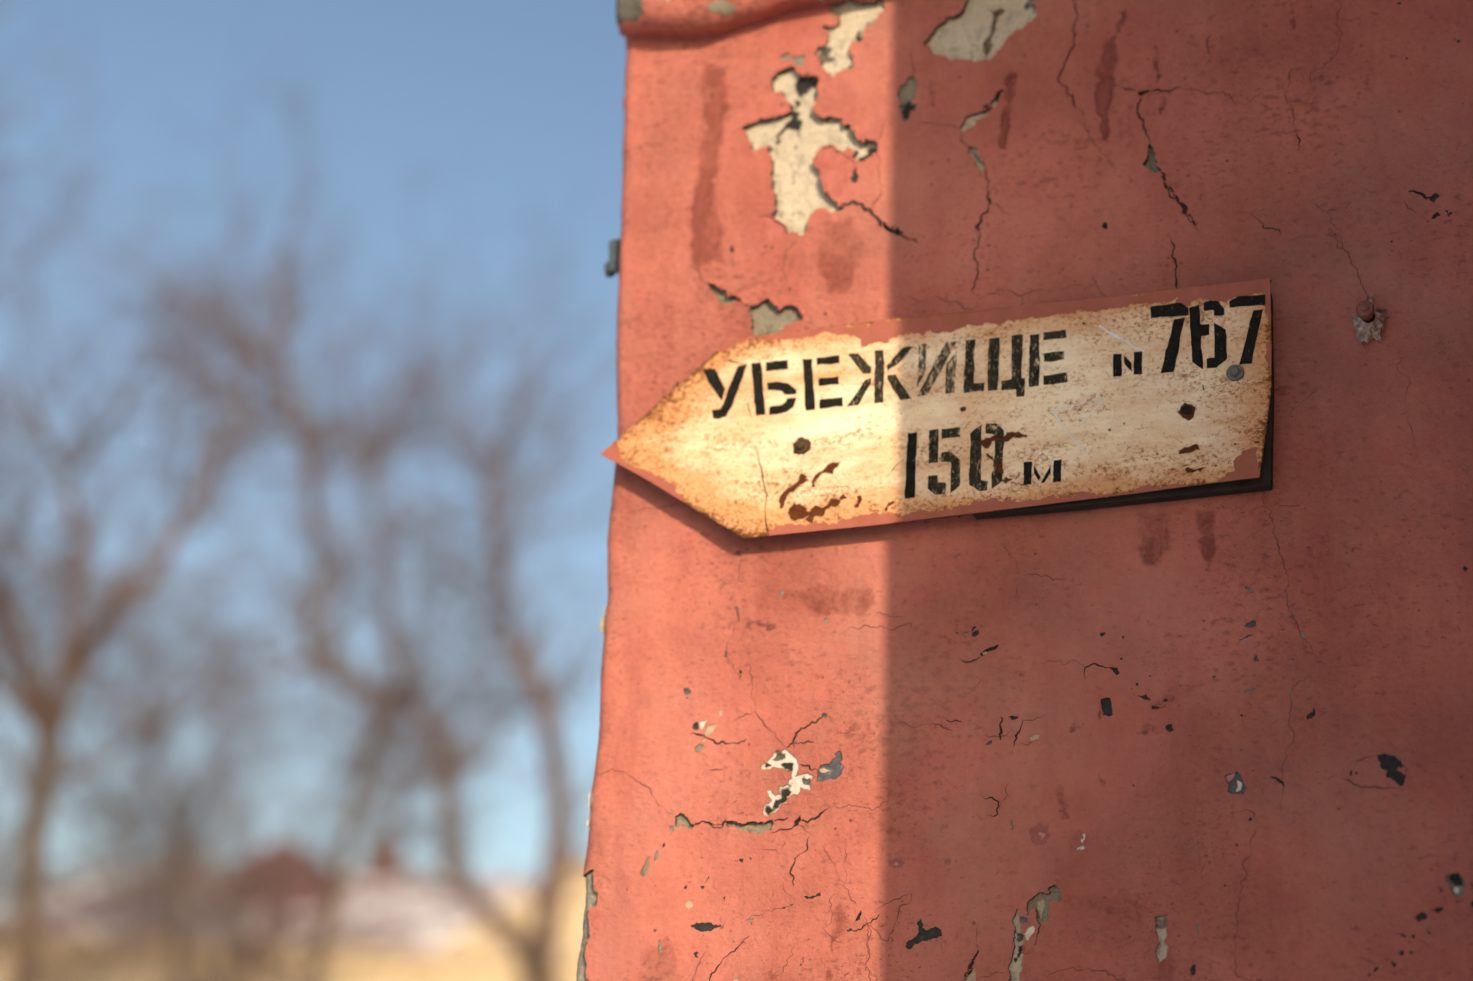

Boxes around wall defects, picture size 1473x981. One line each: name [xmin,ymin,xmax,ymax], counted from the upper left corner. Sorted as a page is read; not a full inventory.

peeling [691,0,885,336]
peeling [898,0,1038,122]
crack [841,92,1107,310]
crack [1057,0,1343,289]
peeling [641,711,851,877]
crack [725,558,783,744]
crack [891,646,1044,817]
peeling [1323,754,1407,789]
crack [692,936,749,981]
crack [763,799,912,981]
crack [962,924,1005,981]
peeling [1009,886,1061,981]